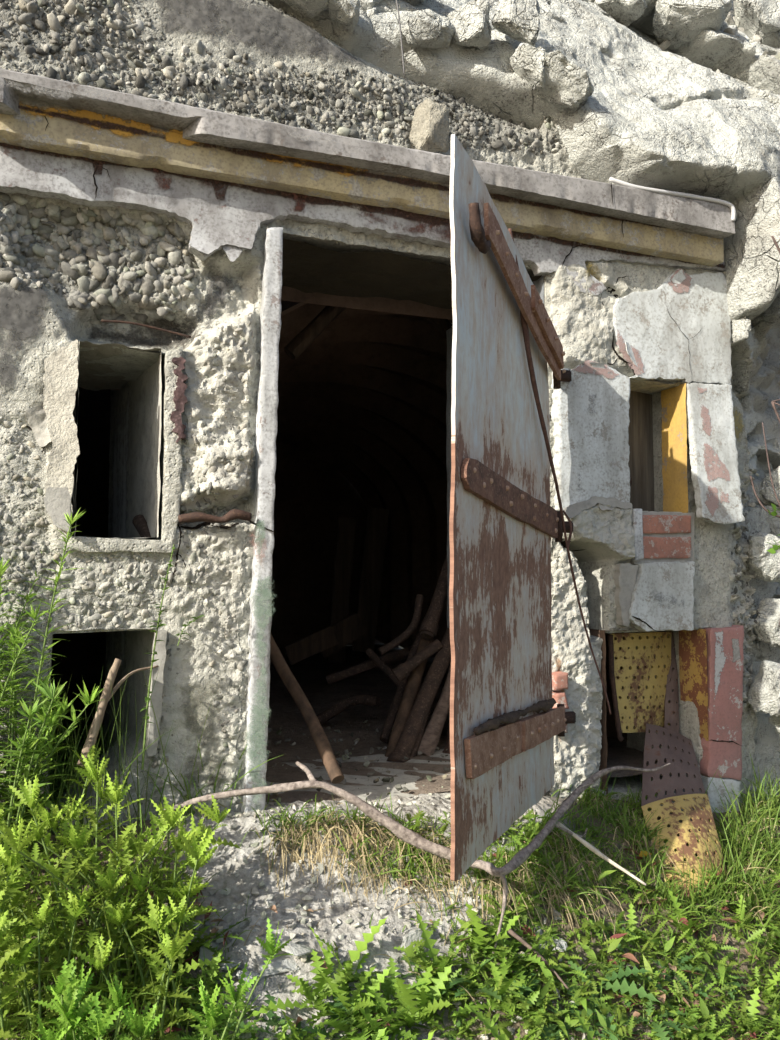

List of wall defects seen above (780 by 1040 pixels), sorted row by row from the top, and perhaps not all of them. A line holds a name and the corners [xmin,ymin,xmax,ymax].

spalling [0,0,567,155]
rust [18,103,450,191]
water stain [0,286,48,388]
spalling [0,192,261,533]
rust [170,357,188,443]
rust [0,142,451,241]
rust [489,193,666,228]
spalling [549,262,644,379]
rust [512,231,694,264]
flaking render [668,269,692,293]
rust [178,509,252,523]